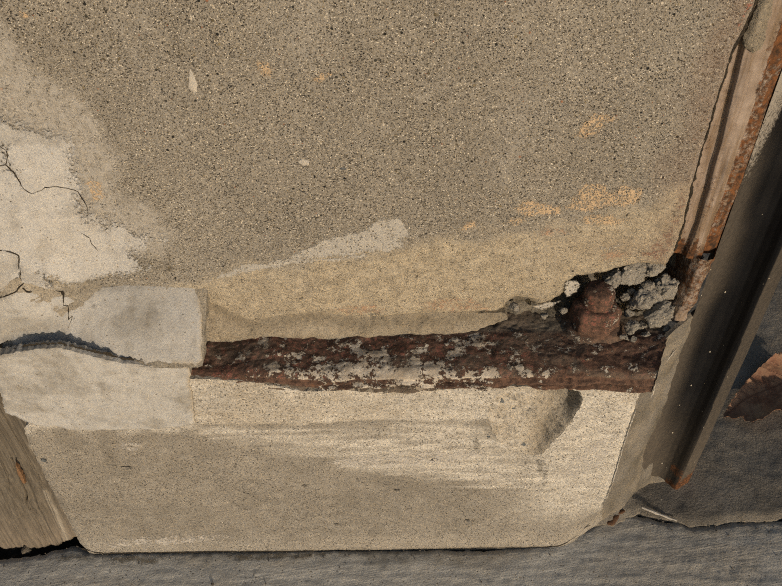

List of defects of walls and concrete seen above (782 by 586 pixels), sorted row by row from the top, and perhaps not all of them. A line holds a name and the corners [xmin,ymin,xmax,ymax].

crack [0,146,88,211]
crack [0,250,32,298]
spalling [505,271,608,317]
spalling [614,253,676,316]
crack [13,342,143,361]